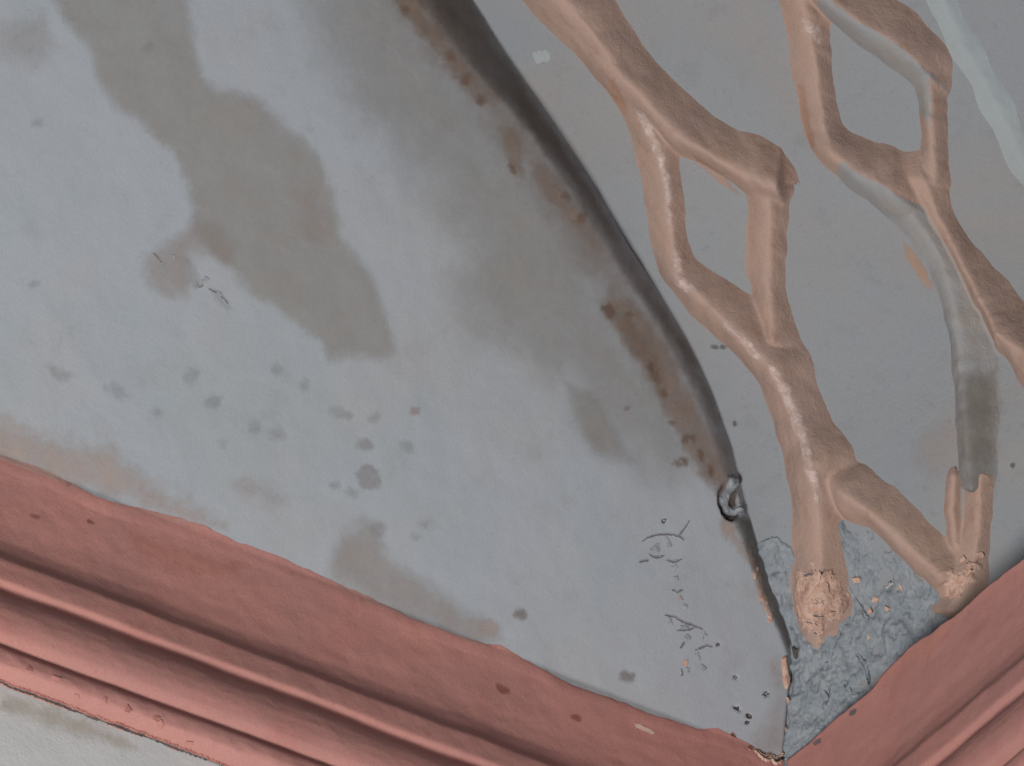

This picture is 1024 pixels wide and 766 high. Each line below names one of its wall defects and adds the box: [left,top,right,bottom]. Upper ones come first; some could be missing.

crack [639,520,690,572]
peeling [745,520,984,766]